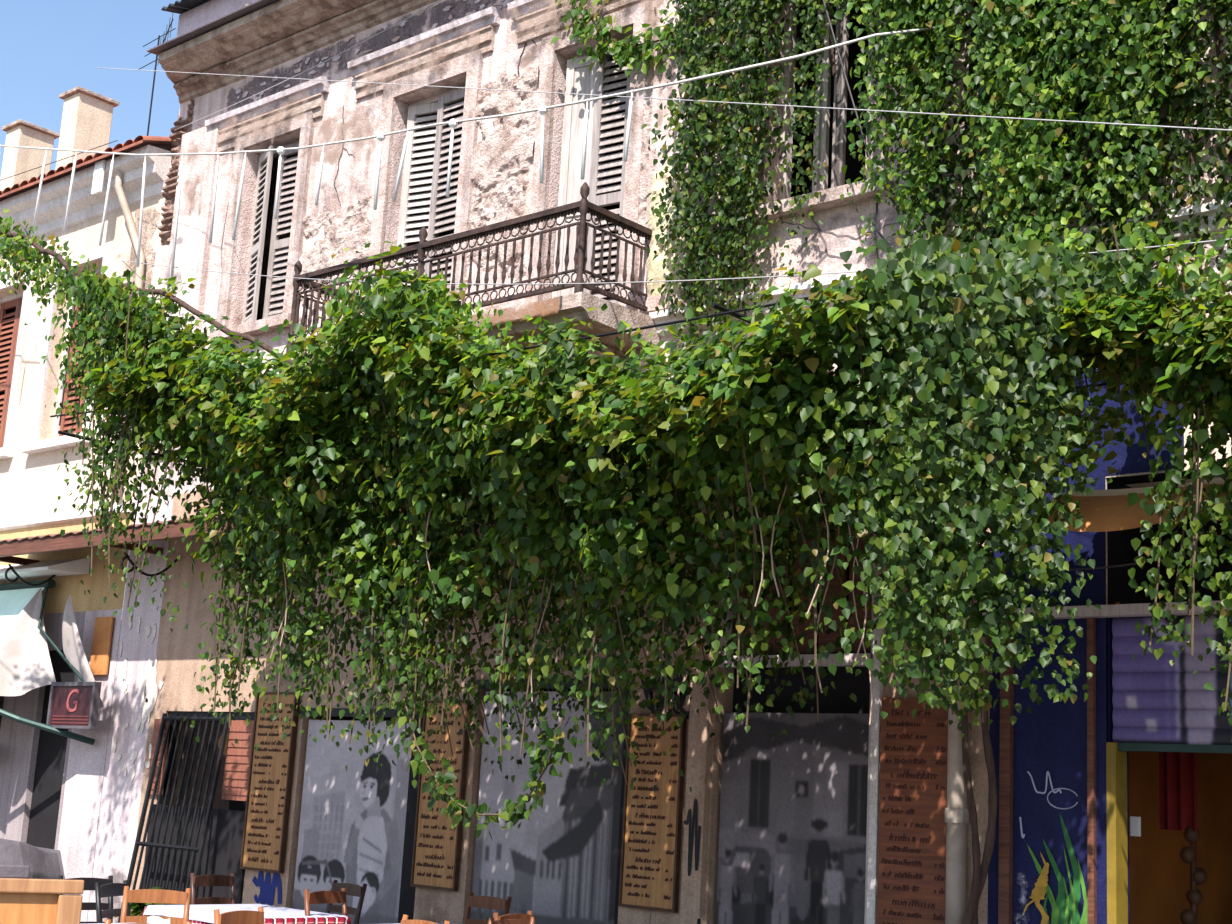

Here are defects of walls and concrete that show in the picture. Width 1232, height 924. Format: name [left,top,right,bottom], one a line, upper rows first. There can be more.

peeling [236,34,373,102]
peeling [432,0,512,29]
spalling [299,196,372,325]
spalling [464,64,539,290]
crack [781,195,898,283]
peeling [114,643,163,781]